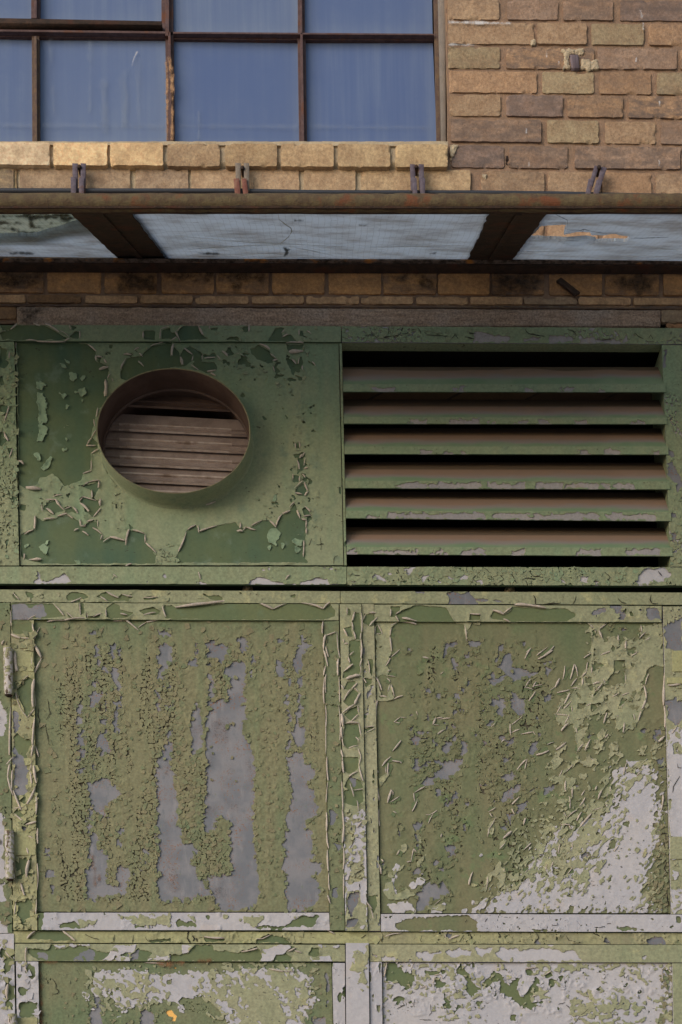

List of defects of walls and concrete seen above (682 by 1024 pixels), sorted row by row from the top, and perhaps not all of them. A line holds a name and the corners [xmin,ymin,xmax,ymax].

peeling [0,323,682,1024]